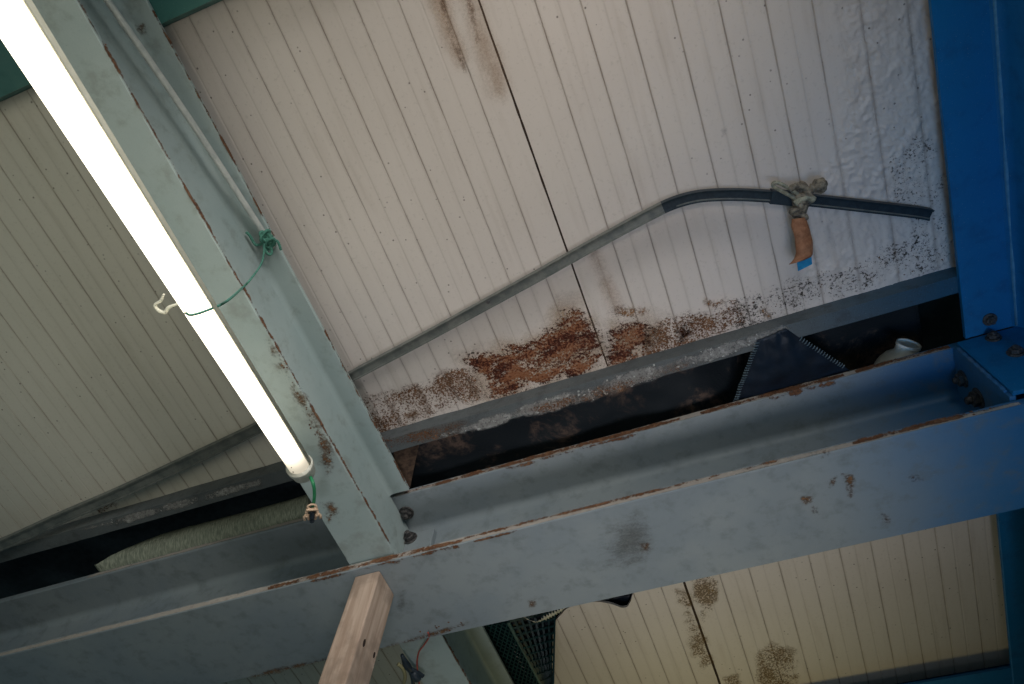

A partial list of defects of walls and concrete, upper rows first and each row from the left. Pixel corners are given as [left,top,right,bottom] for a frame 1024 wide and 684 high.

corrosion [177,172,218,243]
leakage [736,137,949,329]
corrosion [225,256,389,542]
corrosion [324,300,745,494]
corrosion [853,407,995,444]
corrosion [268,475,718,590]